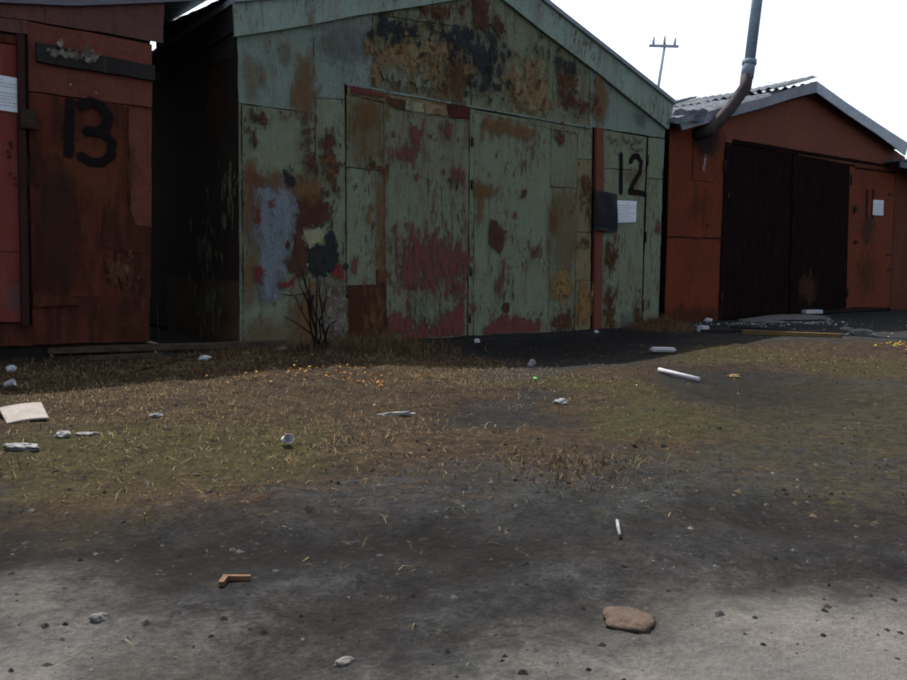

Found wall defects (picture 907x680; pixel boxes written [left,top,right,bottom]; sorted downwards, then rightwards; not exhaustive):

rust [281,34,325,118]
peeling [351,0,513,182]
rust [481,43,609,160]
peeling [526,33,596,116]
peeling [219,104,358,338]
peeling [387,283,469,339]
peeling [480,219,549,334]
rust [551,270,650,332]